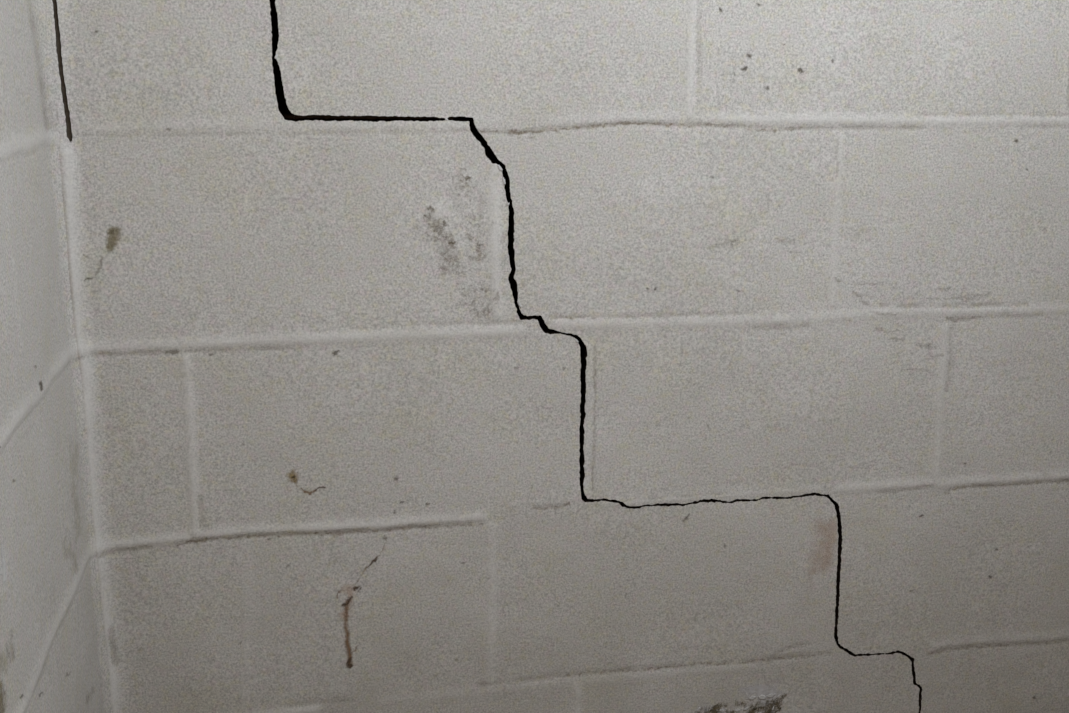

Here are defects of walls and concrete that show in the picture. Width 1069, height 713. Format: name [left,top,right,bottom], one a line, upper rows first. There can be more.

corrosion [338,586,361,668]
crack [269,0,922,713]